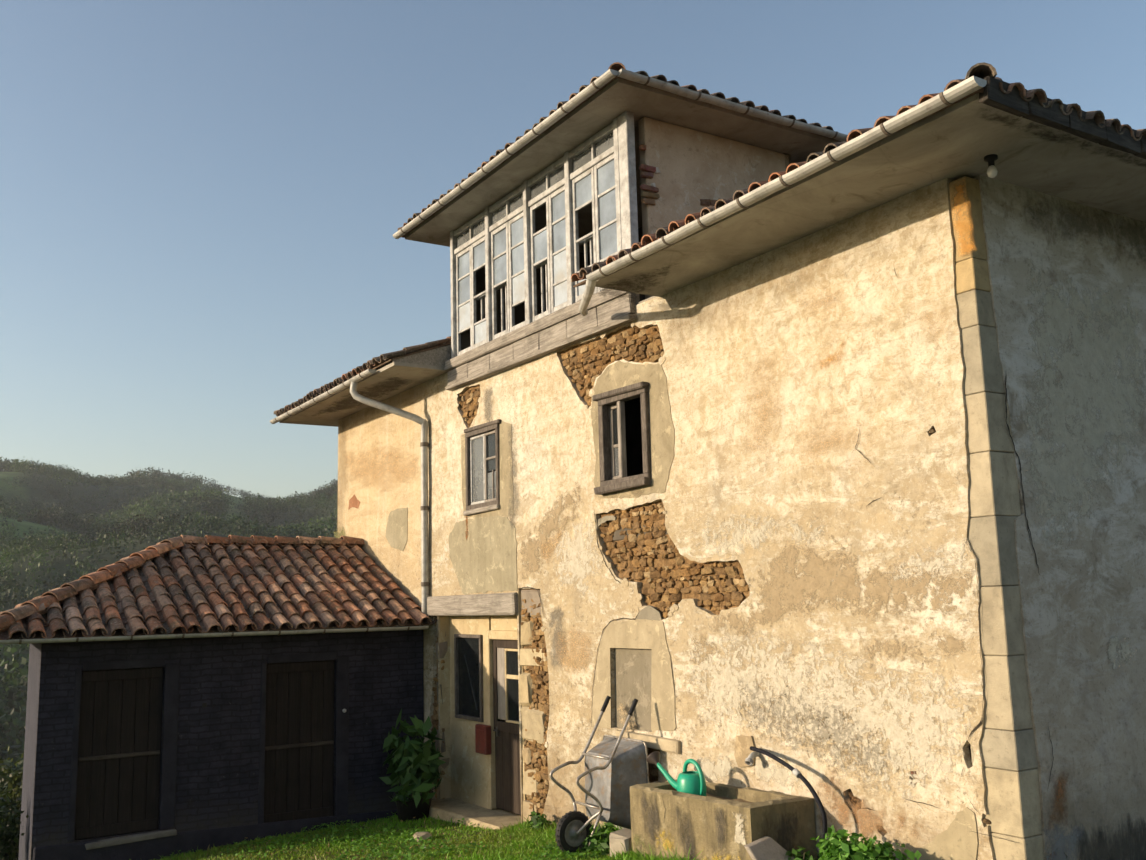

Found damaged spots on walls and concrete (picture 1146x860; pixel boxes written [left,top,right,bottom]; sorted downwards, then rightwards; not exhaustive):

spalling [639,144,660,205]
spalling [456,386,482,428]
spalling [560,321,665,409]
spalling [599,500,972,665]
spalling [521,486,580,819]
crack [966,539,984,739]
water stain [1046,816,1146,860]